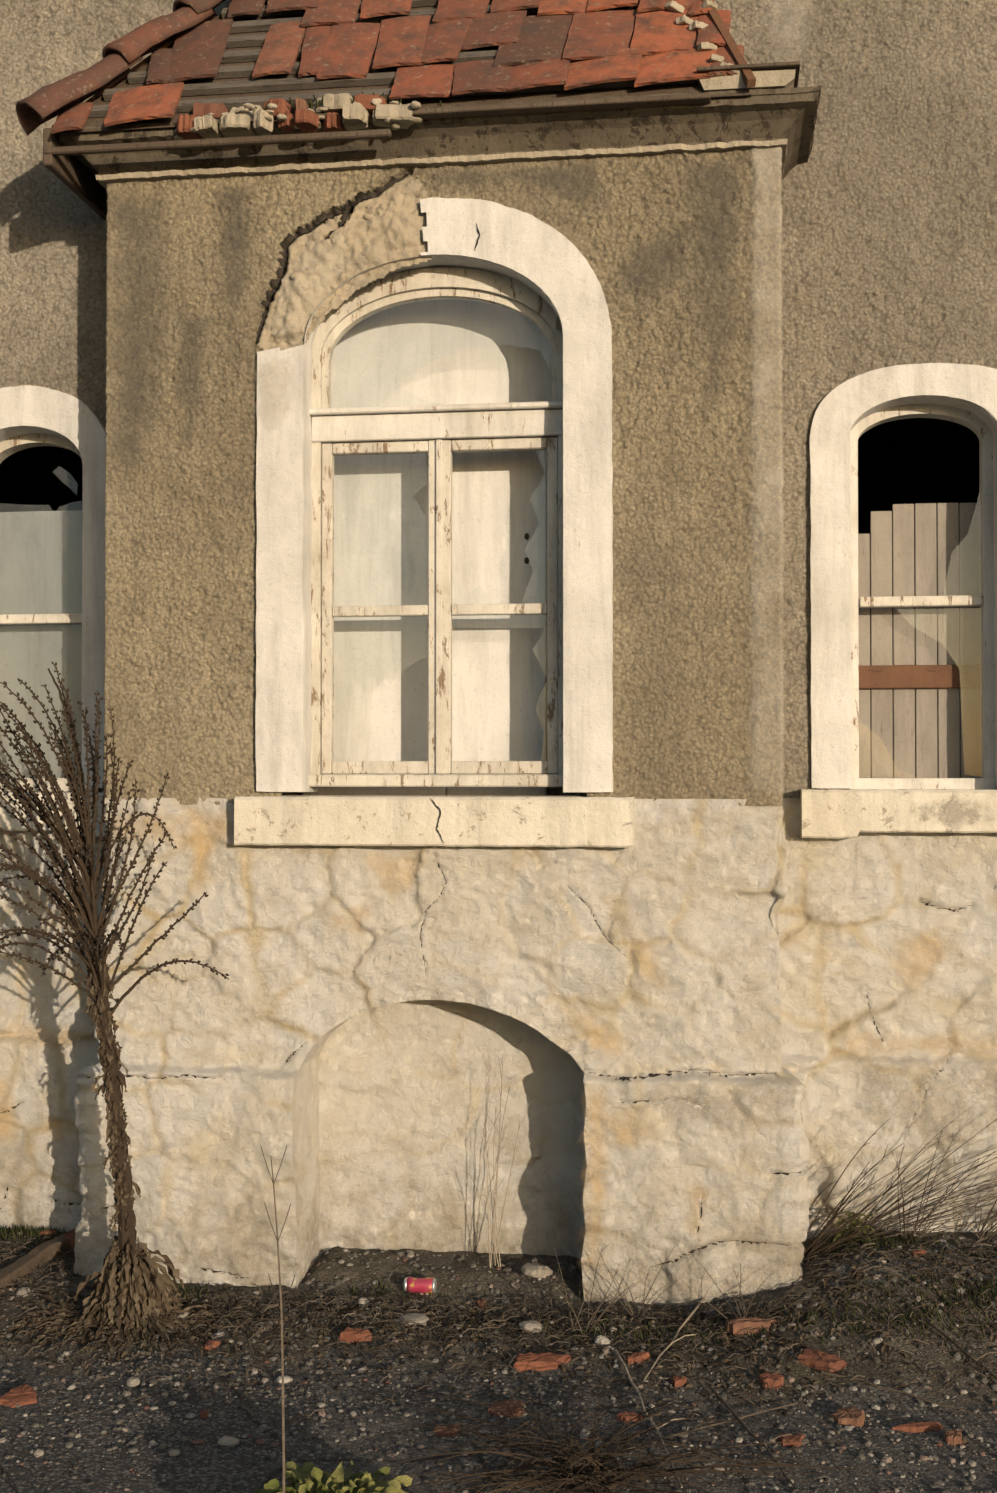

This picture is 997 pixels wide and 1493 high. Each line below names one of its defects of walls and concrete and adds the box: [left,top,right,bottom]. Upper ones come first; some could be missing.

crack [256,172,411,343]
crack [420,797,447,972]
crack [654,1201,789,1267]